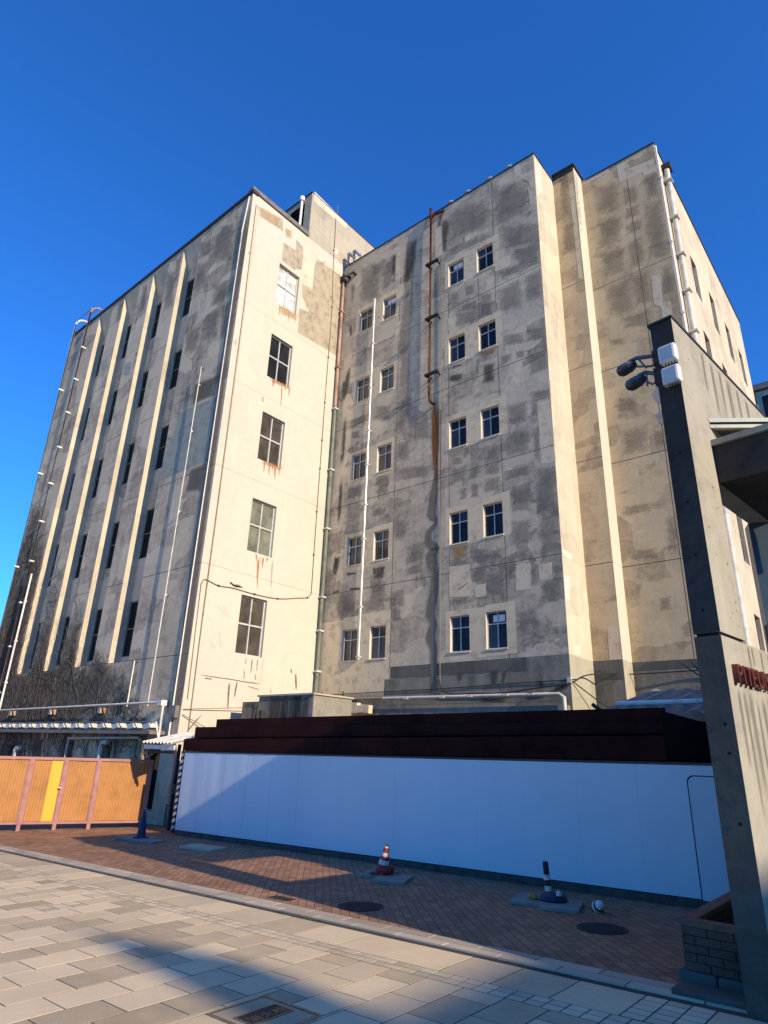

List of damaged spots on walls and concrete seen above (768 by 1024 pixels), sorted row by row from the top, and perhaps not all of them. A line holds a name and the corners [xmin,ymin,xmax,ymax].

leakage [425,482,439,683]